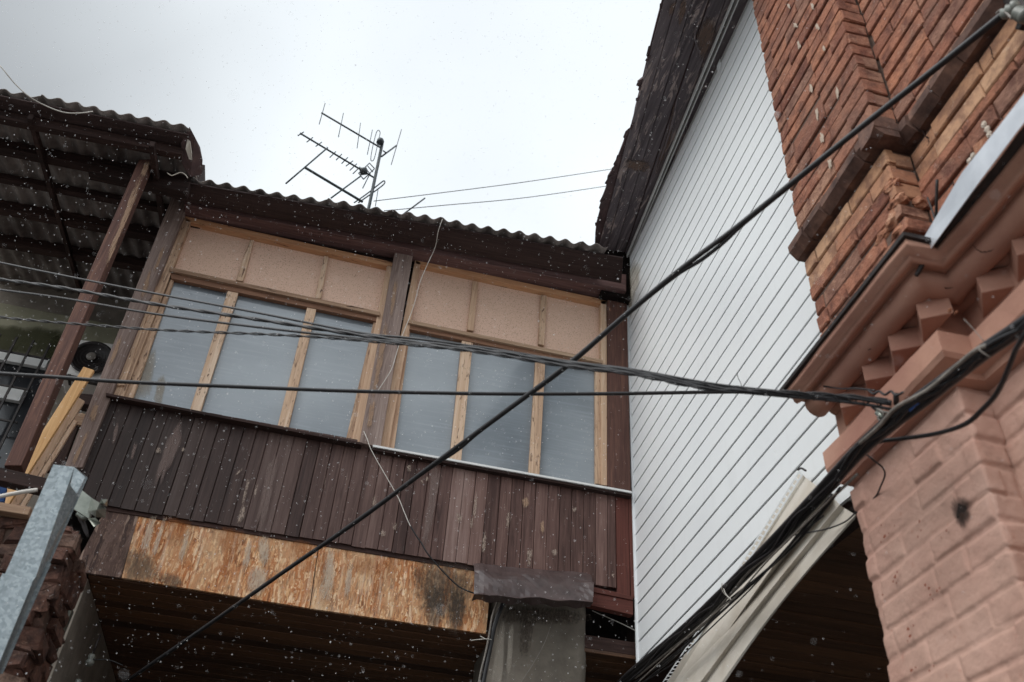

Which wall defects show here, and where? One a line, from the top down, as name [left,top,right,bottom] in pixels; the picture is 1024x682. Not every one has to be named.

spalling [874,177,927,246]
leakage [414,563,470,629]